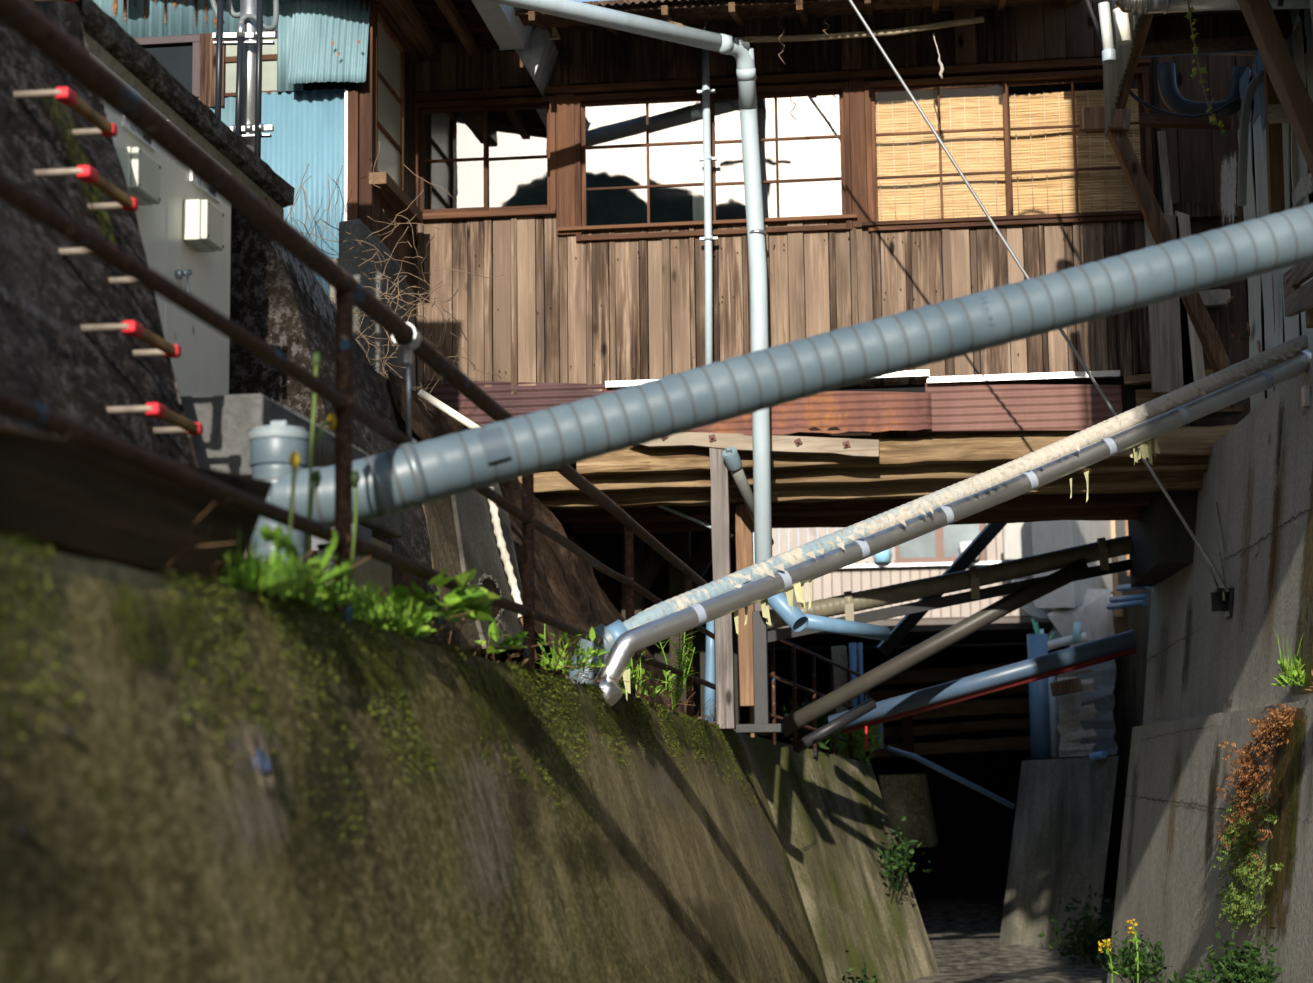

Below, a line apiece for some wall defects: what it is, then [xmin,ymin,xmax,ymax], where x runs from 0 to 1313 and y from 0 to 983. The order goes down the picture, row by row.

crack [1220,508,1313,561]
damp [1294,587,1313,693]
damp [1265,719,1313,917]